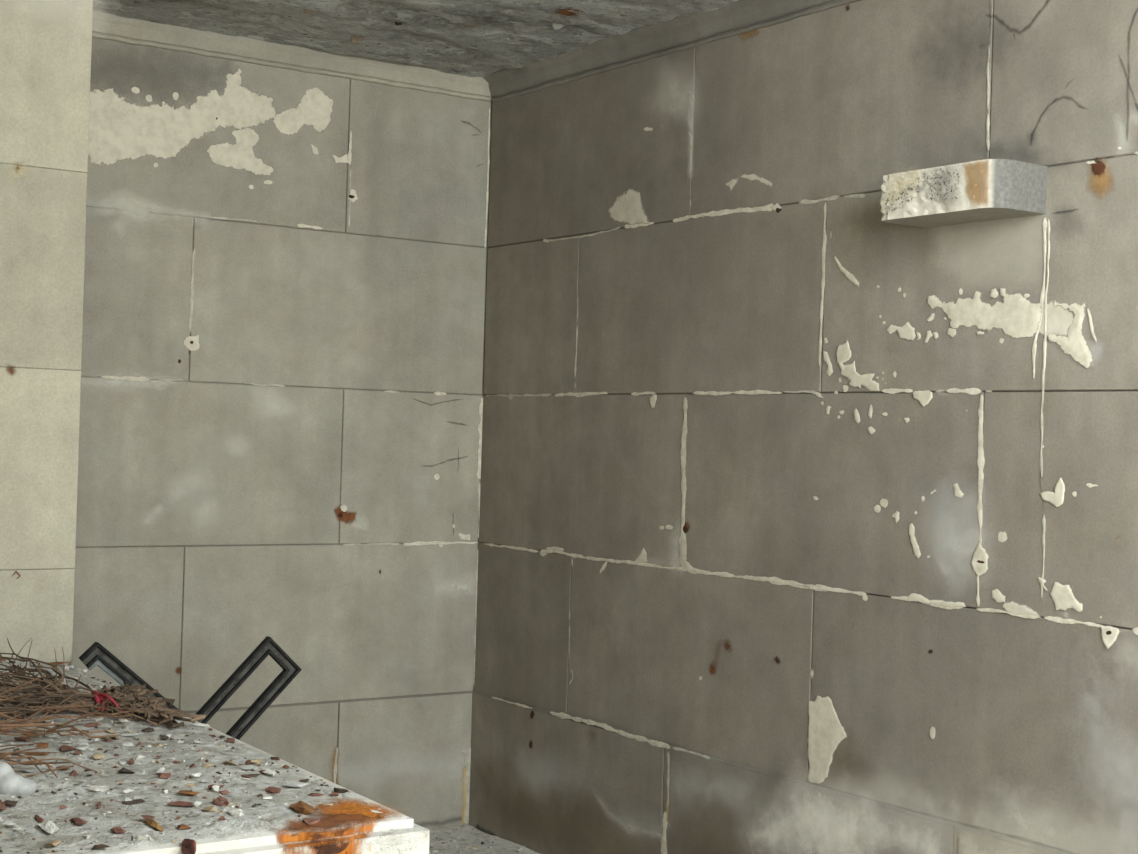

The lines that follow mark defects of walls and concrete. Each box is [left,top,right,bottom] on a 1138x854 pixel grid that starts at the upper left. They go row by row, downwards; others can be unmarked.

flaking render [88,68,333,189]
rust [966,162,988,203]
rust [1086,160,1110,193]
flaking render [609,189,649,225]
flaking render [879,288,1097,368]
flaking render [815,338,910,434]
flaking render [1040,477,1098,507]
rust [335,505,355,523]
flaking render [1038,577,1083,618]
flaking render [807,696,847,784]
rust [278,799,394,854]